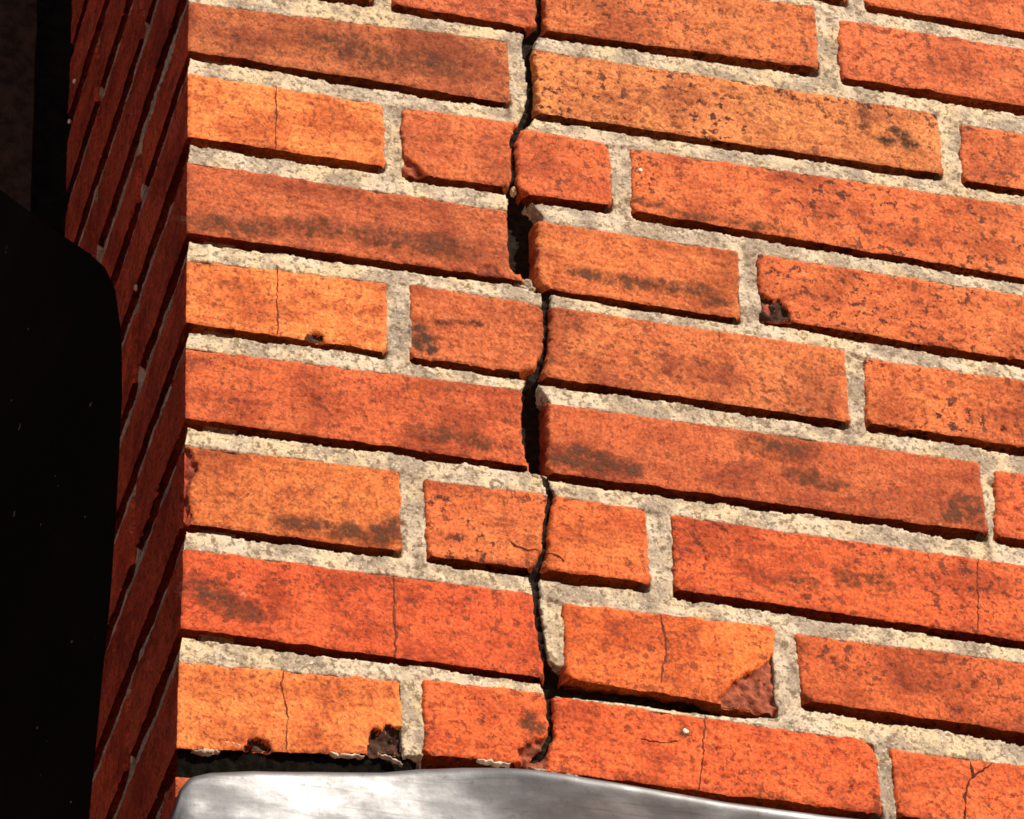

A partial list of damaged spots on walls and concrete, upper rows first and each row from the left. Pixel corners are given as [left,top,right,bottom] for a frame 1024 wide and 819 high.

spalling [759,295,791,323]
crack [501,0,565,769]
crack [280,671,289,749]
spalling [542,659,778,717]
peeling [177,724,416,778]
crack [963,761,992,819]